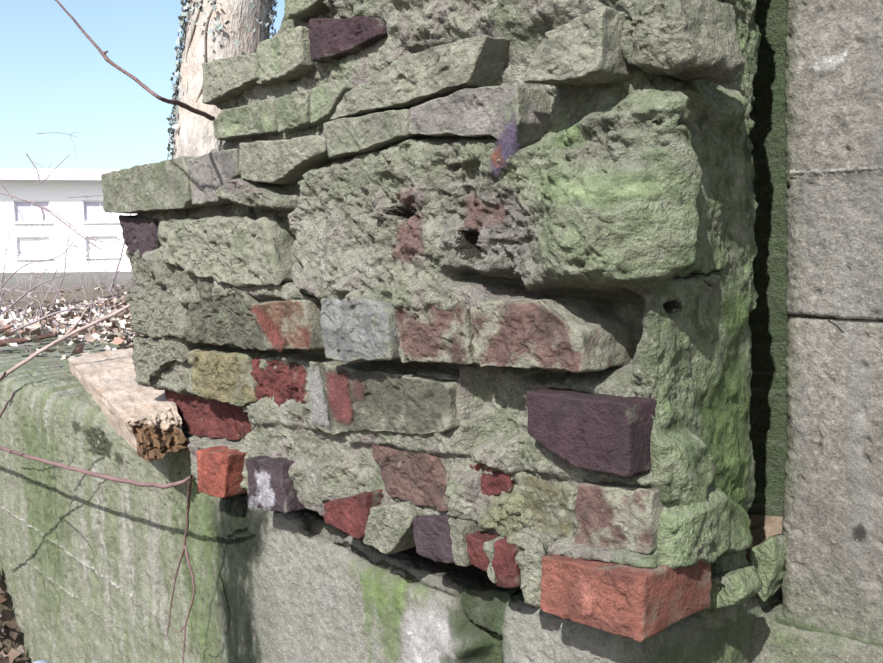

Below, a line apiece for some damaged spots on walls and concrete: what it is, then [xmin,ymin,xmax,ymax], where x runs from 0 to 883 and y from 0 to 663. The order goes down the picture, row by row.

water stain [204,471,275,663]